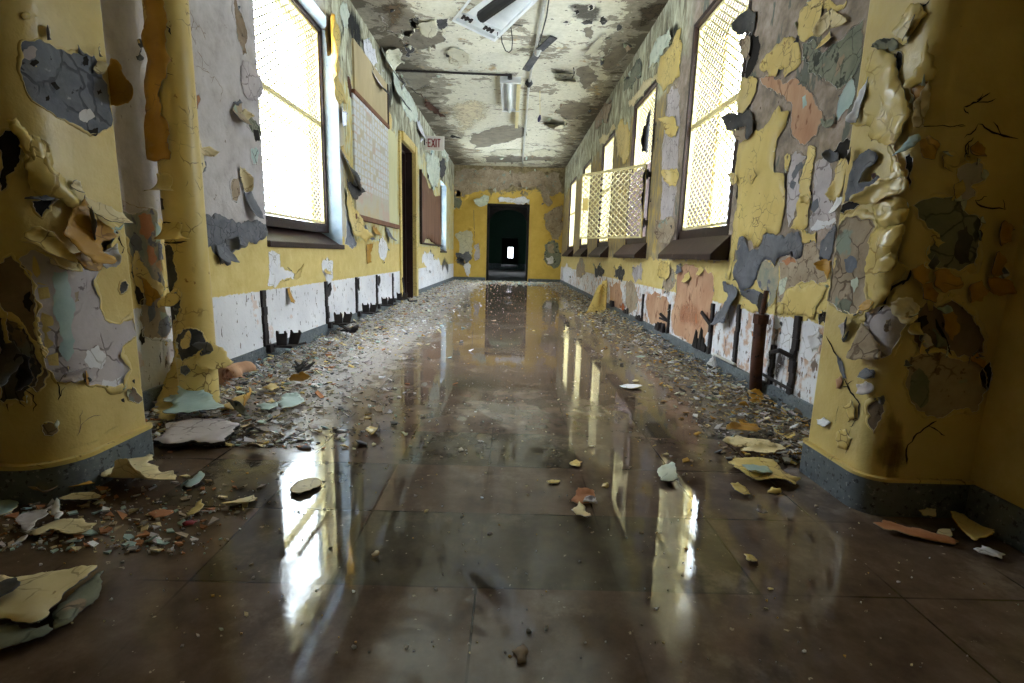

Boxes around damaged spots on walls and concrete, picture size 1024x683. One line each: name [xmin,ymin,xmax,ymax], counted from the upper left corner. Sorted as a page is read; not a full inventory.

peeling [0,0,233,411]
peeling [206,0,304,303]
peeling [363,0,993,434]
crack [916,93,1018,155]
crack [905,421,945,464]